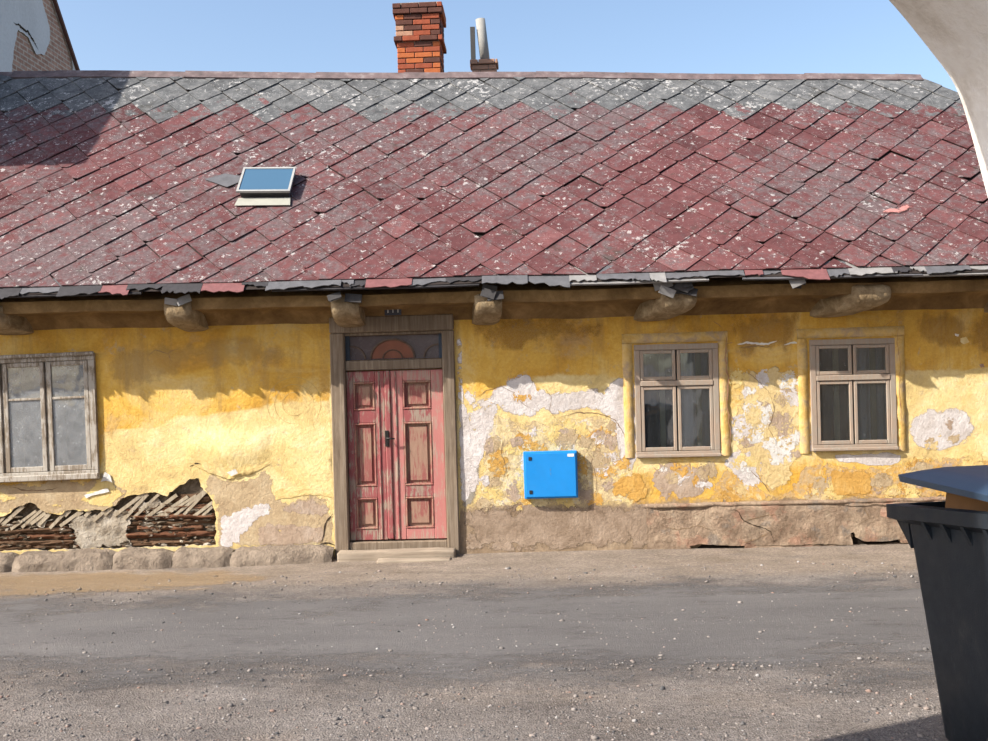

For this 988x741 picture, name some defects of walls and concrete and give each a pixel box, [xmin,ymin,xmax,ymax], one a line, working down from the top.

spalling [12,0,73,72]
peeling [457,339,988,518]
spalling [0,457,334,551]
crack [730,504,909,546]